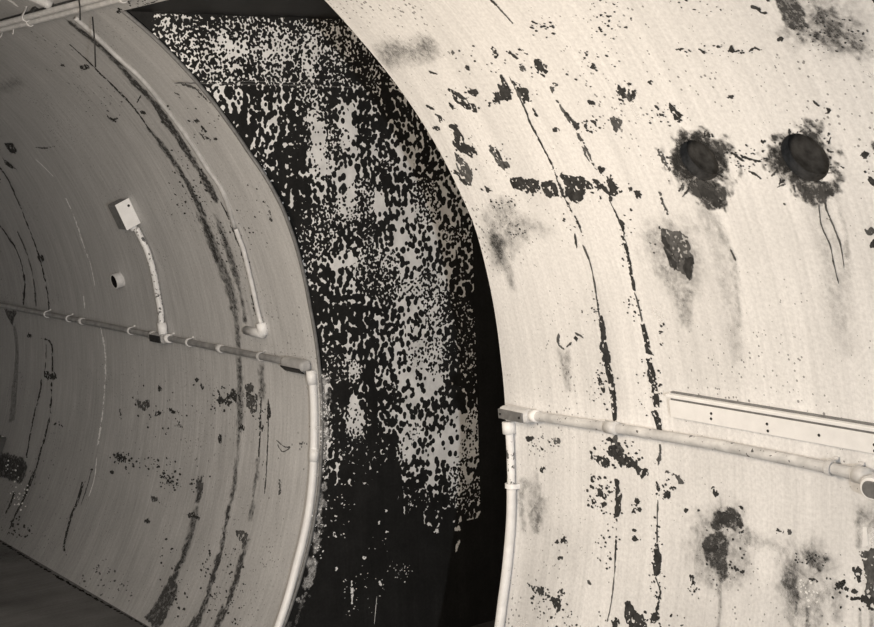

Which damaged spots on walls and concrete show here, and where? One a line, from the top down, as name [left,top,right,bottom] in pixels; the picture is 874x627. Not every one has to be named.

damp [751,0,868,60]
peeling [445,45,558,117]
peeling [577,100,622,134]
peeling [616,82,636,105]
corrosion [860,142,874,186]
corrosion [657,119,844,284]
corrosion [649,226,694,281]
peeling [153,14,510,587]
corrosion [696,506,745,586]
peeling [527,583,578,627]
damp [781,552,828,622]
corrosion [826,548,874,611]